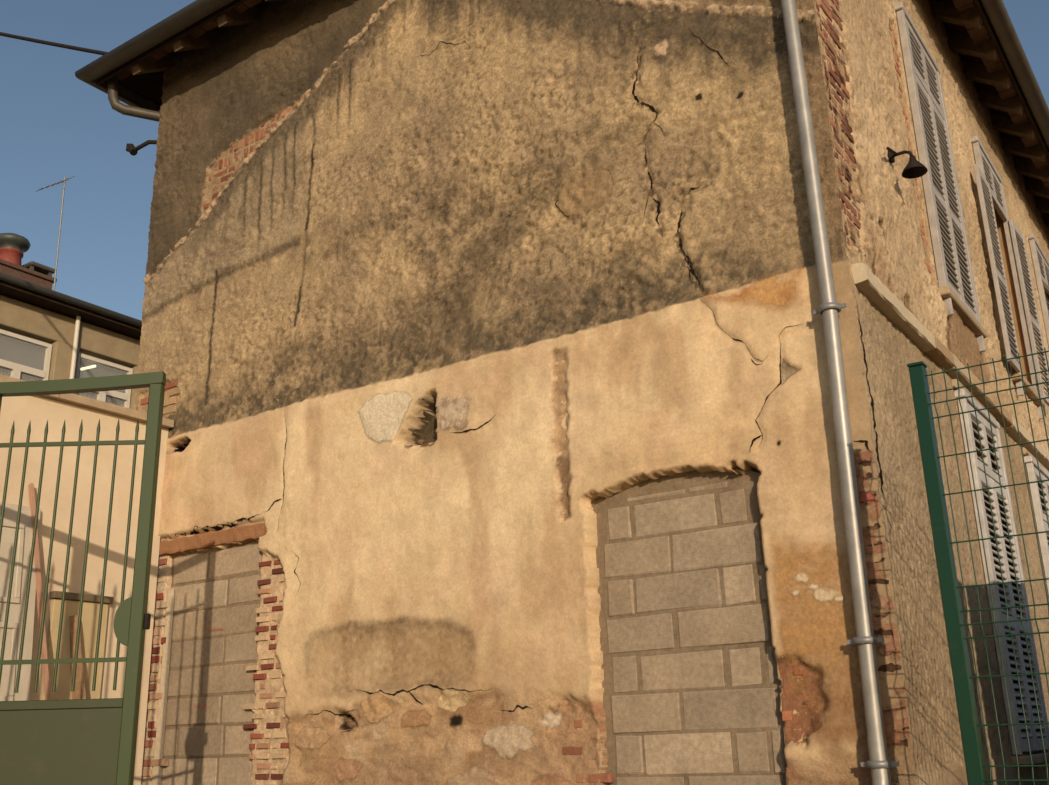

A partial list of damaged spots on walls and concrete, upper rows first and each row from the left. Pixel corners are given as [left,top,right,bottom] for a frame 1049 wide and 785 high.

flaking render [200,89,309,216]
crack [628,47,801,449]
flaking render [163,380,180,418]
leakage [167,268,328,438]
spalling [358,392,494,447]
leakage [338,256,720,389]
crack [854,288,892,541]
leakage [342,618,465,639]
flaking render [243,548,614,785]
spalling [777,655,827,745]